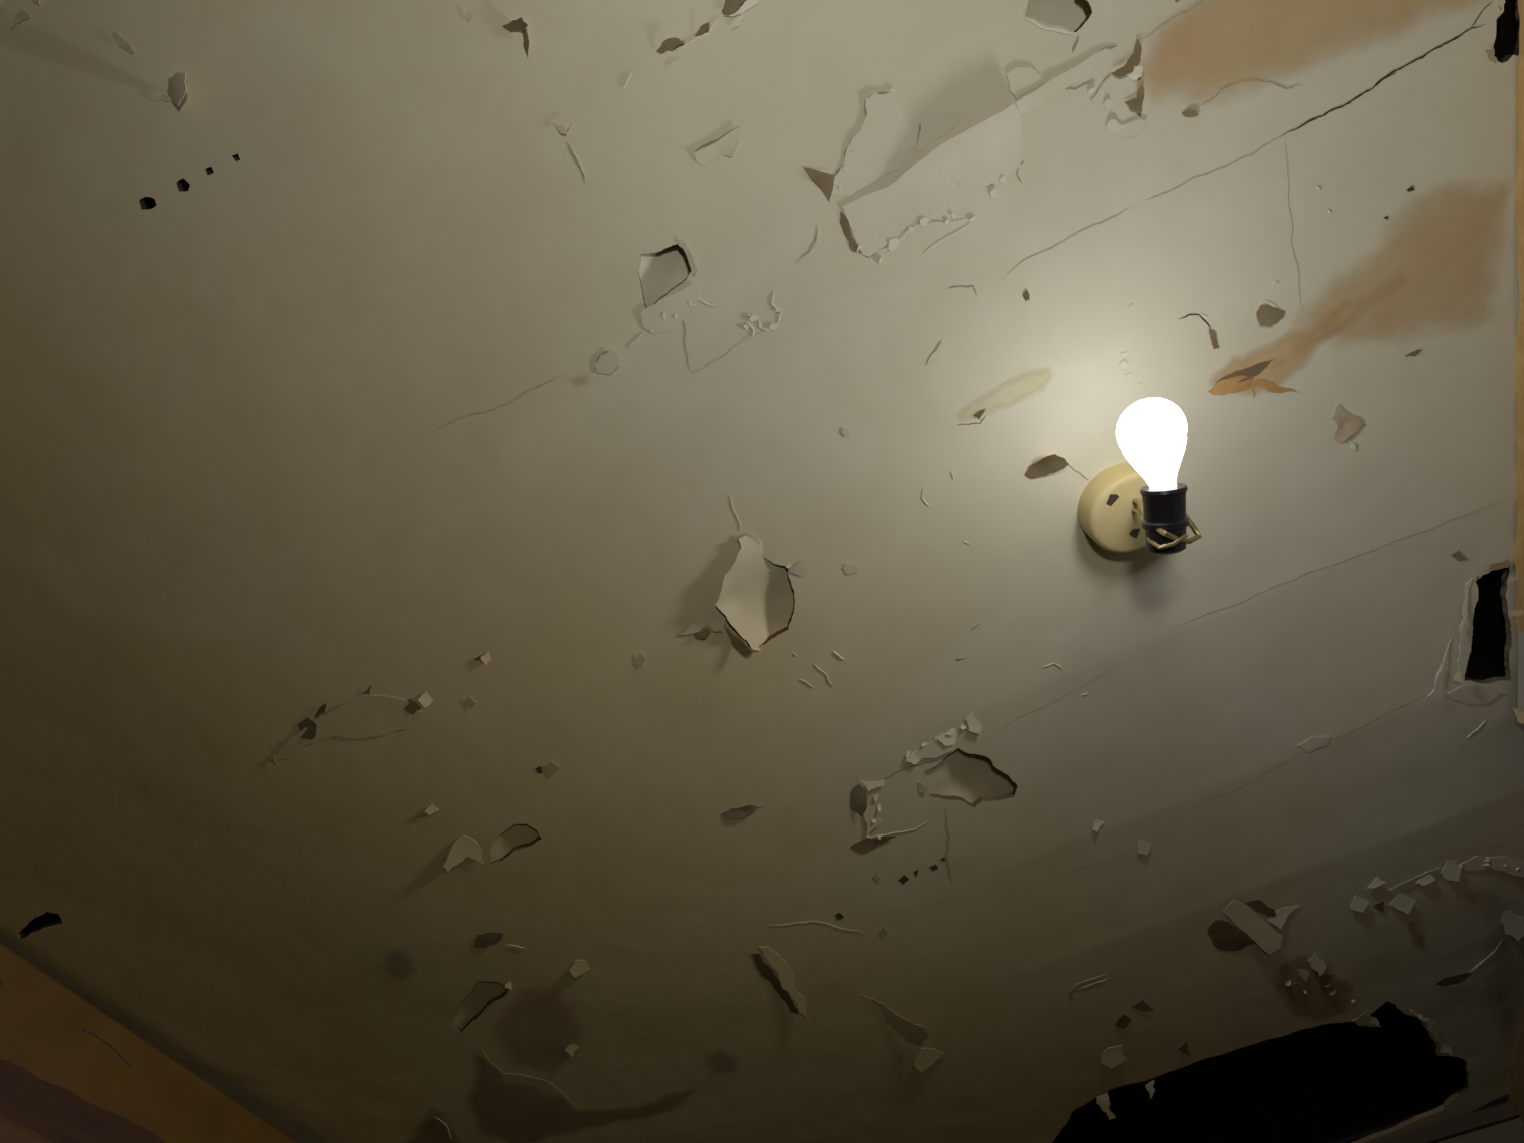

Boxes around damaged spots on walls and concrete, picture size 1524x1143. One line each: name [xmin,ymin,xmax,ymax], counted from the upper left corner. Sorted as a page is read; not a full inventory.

peeling [656,0,760,68]
water stain [1153,0,1457,85]
peeling [803,0,1148,264]
crack [948,0,1493,310]
spalling [627,240,718,348]
water stain [1218,197,1496,391]
peeling [1465,0,1524,680]
peeling [680,494,810,657]
spalling [850,712,1015,854]
peeling [1207,900,1300,955]
peeling [1350,856,1524,915]
spalling [1052,999,1465,1143]